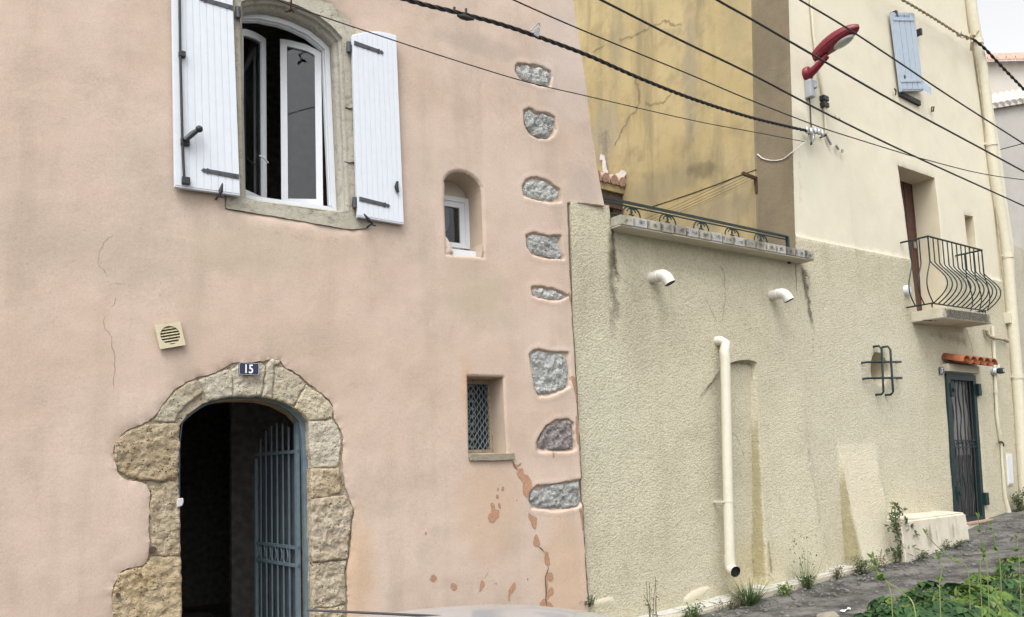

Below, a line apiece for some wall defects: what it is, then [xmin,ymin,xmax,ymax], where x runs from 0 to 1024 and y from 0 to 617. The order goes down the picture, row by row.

peeling [488,487,504,523]
flaking render [513,463,583,607]